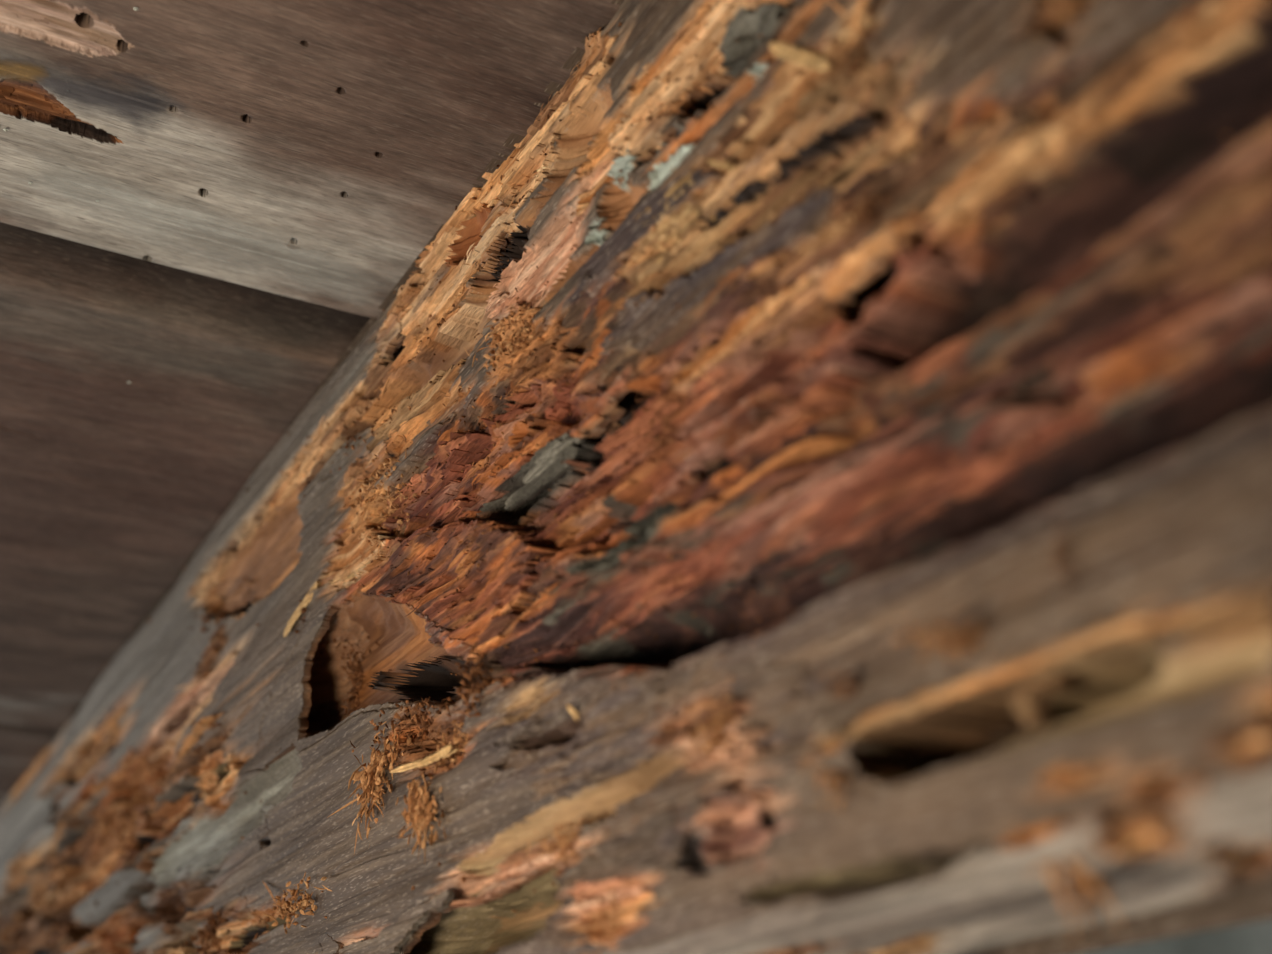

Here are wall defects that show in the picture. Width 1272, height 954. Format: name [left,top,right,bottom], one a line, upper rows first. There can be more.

spalling [189,0,1272,691]
spalling [0,713,295,954]
spalling [448,592,1272,951]